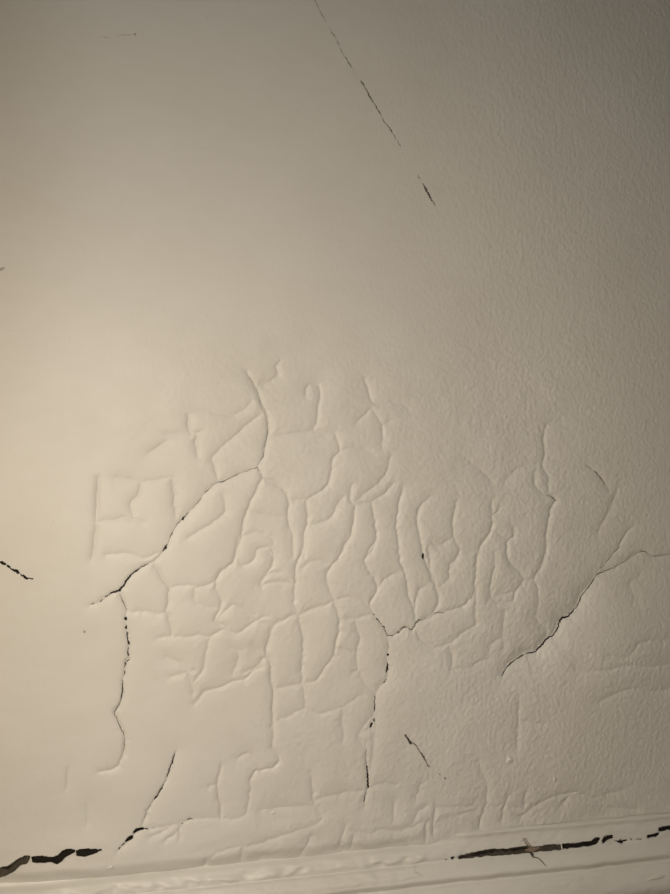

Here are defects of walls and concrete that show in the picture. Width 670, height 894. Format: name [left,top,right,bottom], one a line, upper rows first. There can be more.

crack [315,0,401,146]
crack [0,561,33,580]
crack [92,380,268,751]
crack [369,612,443,728]
crack [501,546,670,676]
crack [0,754,175,877]
crack [362,749,370,801]
crack [445,825,670,860]